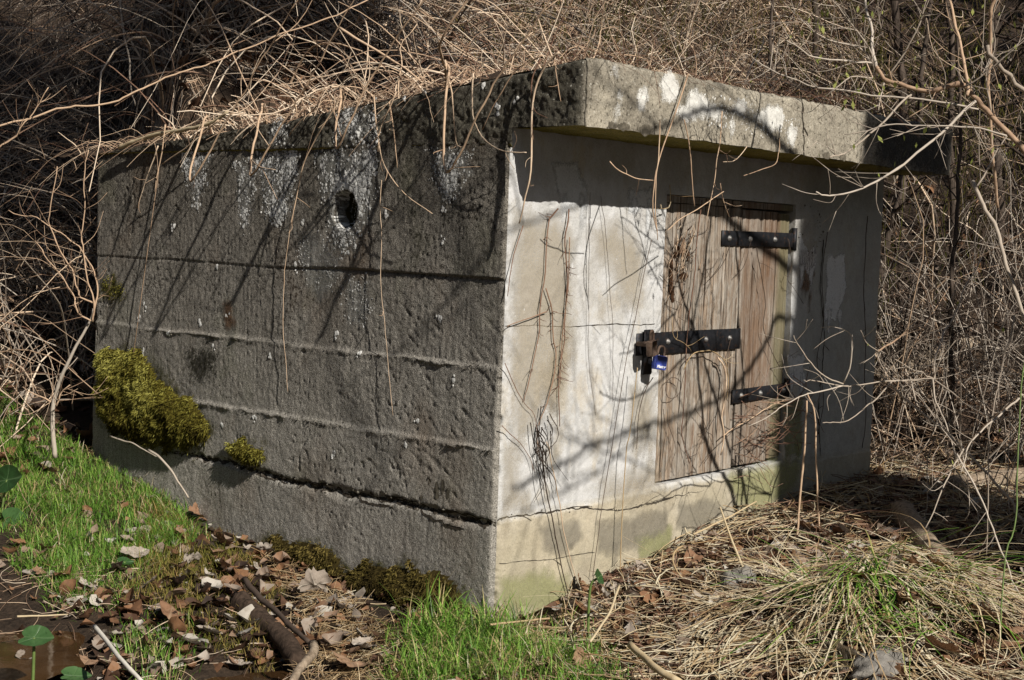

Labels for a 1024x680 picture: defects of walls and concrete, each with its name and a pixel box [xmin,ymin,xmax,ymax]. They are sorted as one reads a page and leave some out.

water stain [181,151,213,214]
water stain [232,116,301,235]
water stain [184,343,221,393]
crack [173,451,702,530]